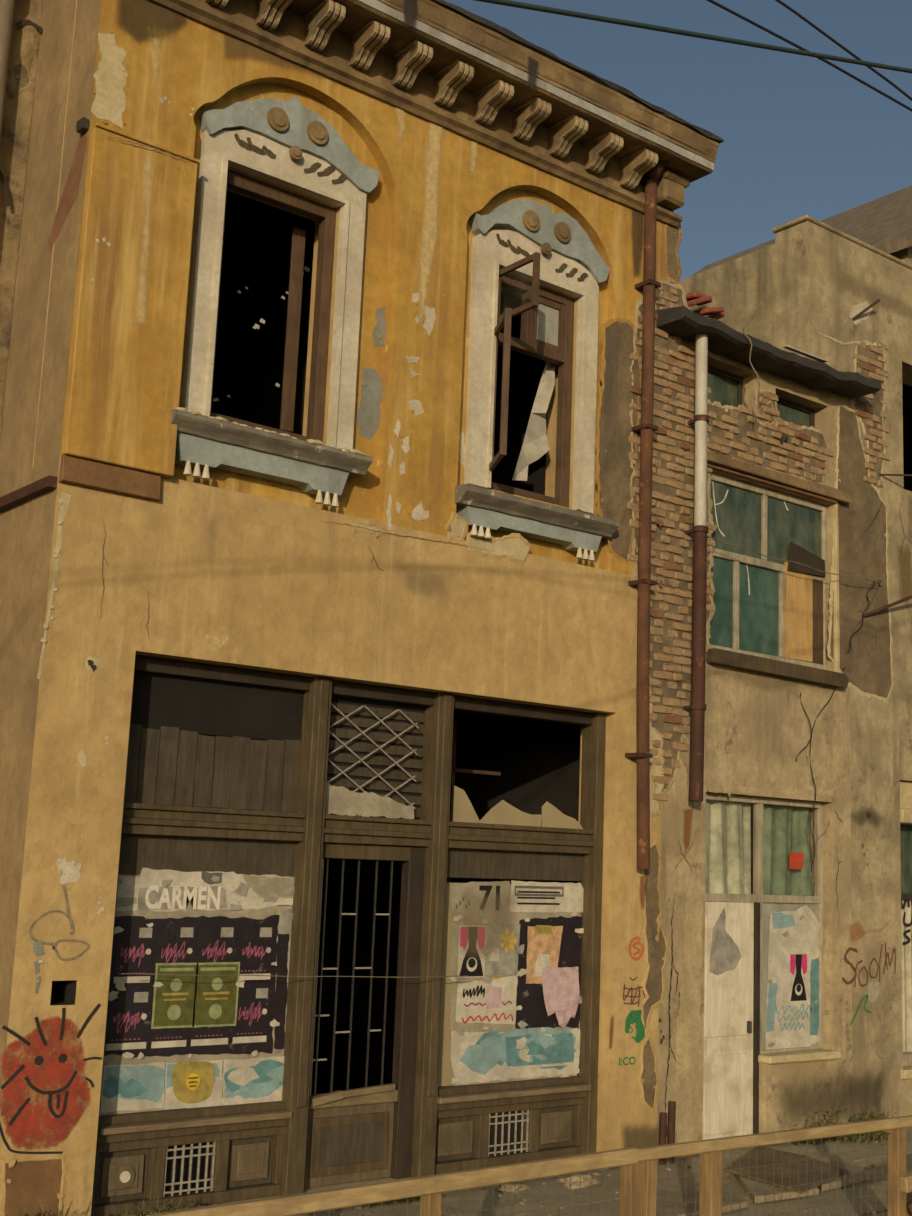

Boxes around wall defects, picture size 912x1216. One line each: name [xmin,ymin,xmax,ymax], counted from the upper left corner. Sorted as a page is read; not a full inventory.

peeling [91,31,128,129]
peeling [372,306,386,348]
peeling [412,292,436,336]
peeling [406,356,421,379]
peeling [356,368,383,440]
peeling [408,399,424,416]
peeling [388,419,410,475]
flaking render [349,495,429,537]
flaking render [445,511,531,565]
flaking render [595,223,894,817]
flaking render [37,492,71,679]
crack [99,521,108,621]